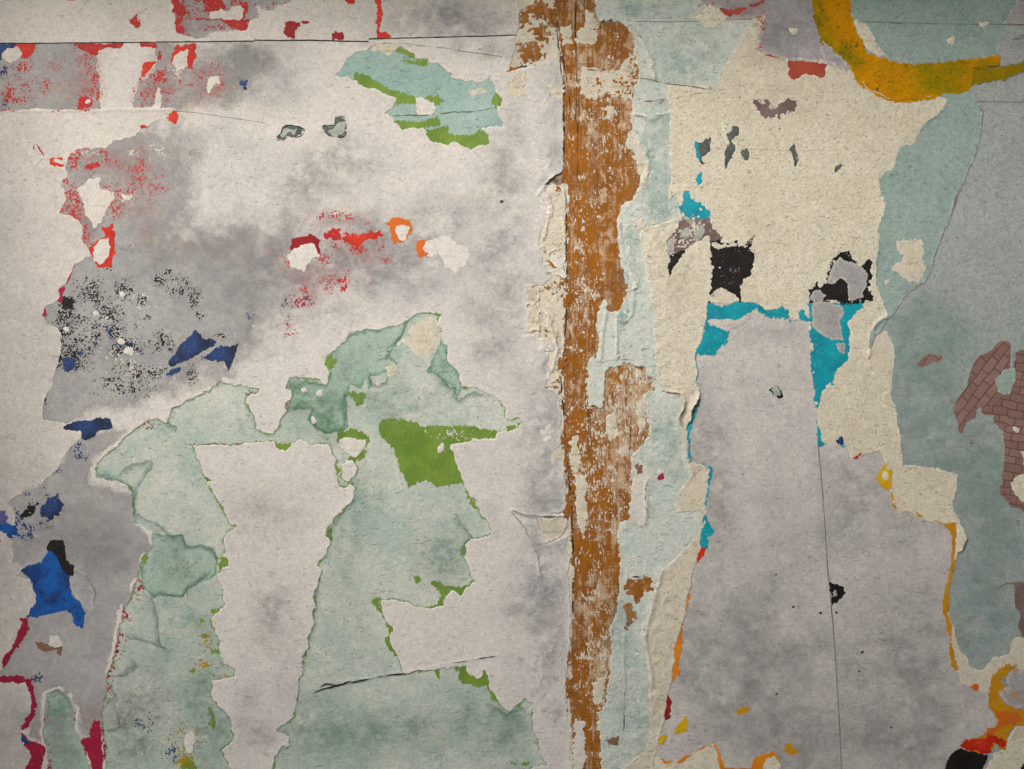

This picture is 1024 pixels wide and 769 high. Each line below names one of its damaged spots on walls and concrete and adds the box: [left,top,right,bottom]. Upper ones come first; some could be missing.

peeling [0,43,124,113]
peeling [128,0,291,124]
peeling [283,21,310,39]
peeling [279,211,470,341]
peeling [757,304,809,322]
peeling [0,125,264,769]
peeling [696,466,715,563]
crack [817,420,842,769]
peeling [829,582,846,605]
peeling [876,462,958,671]
crack [313,673,406,693]
peeling [658,695,689,746]